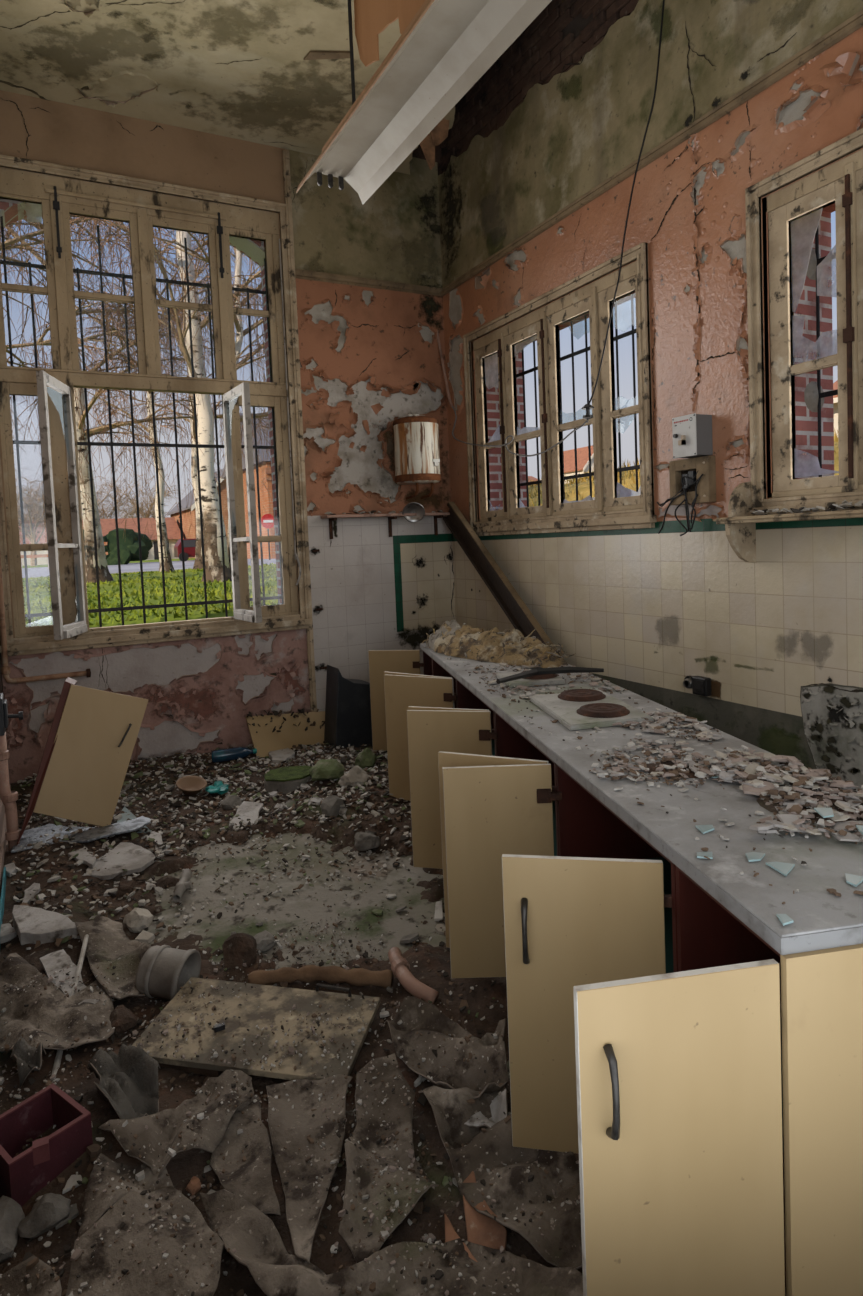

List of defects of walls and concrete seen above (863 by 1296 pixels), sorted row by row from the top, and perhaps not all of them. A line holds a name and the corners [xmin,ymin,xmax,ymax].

crack [0,10,71,30]
crack [105,0,185,8]
spalling [439,0,639,175]
peeling [687,51,863,214]
crack [651,21,750,478]
peeling [697,230,747,282]
peeling [300,299,351,356]
peeling [300,357,448,516]
peeling [1,631,297,762]